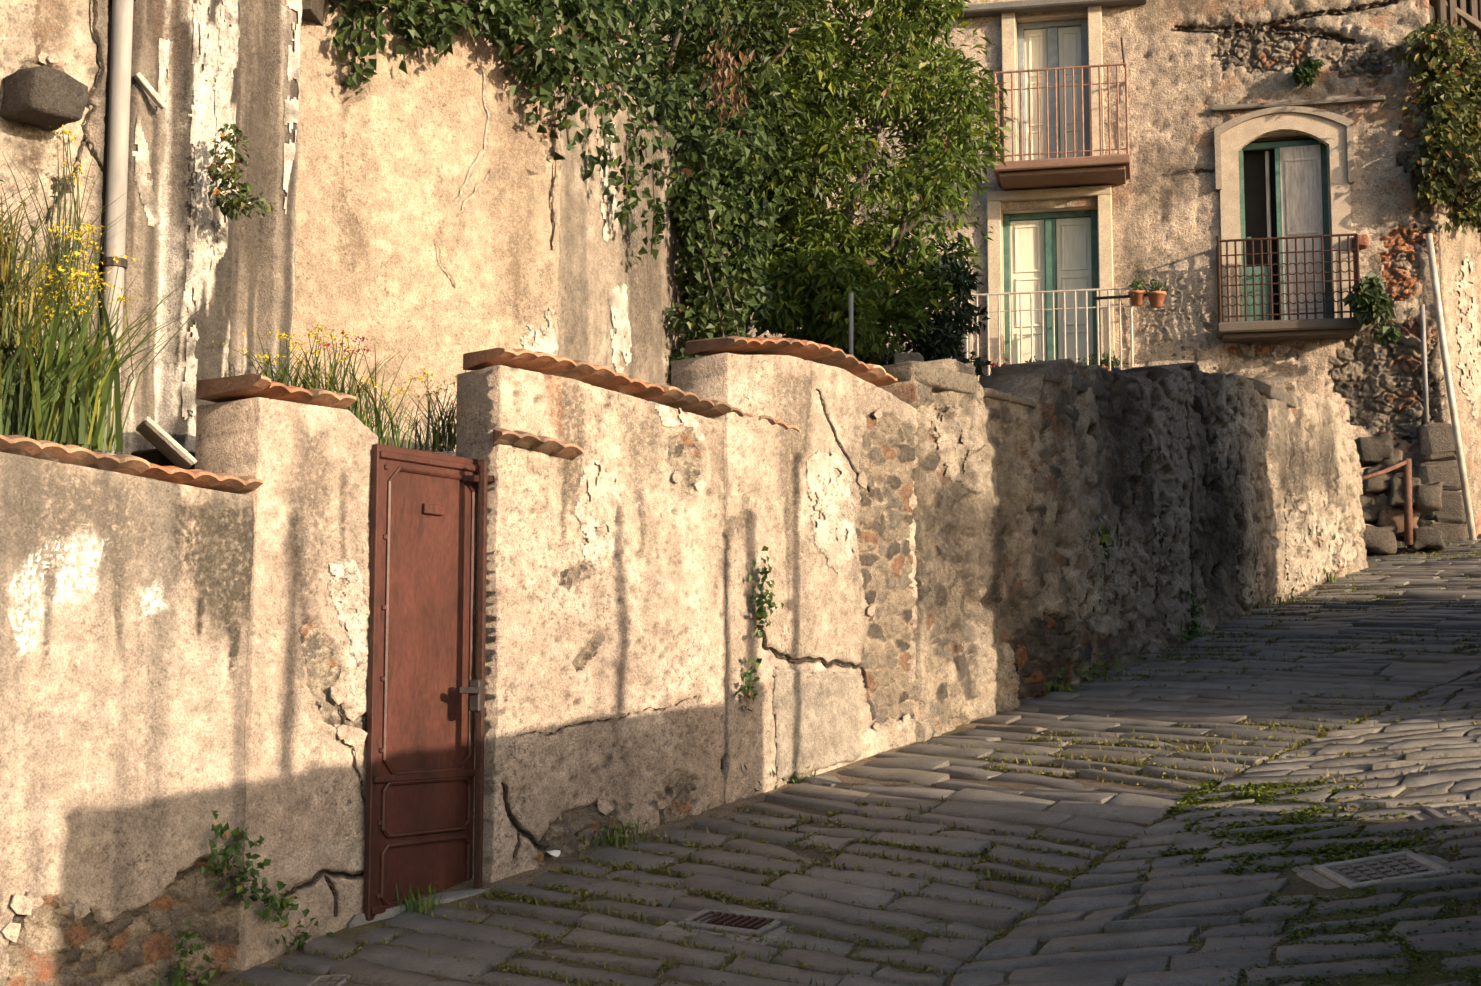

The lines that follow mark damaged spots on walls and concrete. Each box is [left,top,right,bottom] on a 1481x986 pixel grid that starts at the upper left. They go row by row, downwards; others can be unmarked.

spalling [1210,23,1404,87]
crack [432,50,492,288]
spalling [1327,90,1440,447]
flaking render [1454,252,1481,419]
damp [6,458,141,659]
damp [174,503,255,677]
crack [518,696,697,736]
crack [757,624,868,688]
crack [501,783,543,858]
spalling [1,858,243,986]
crack [283,869,364,917]